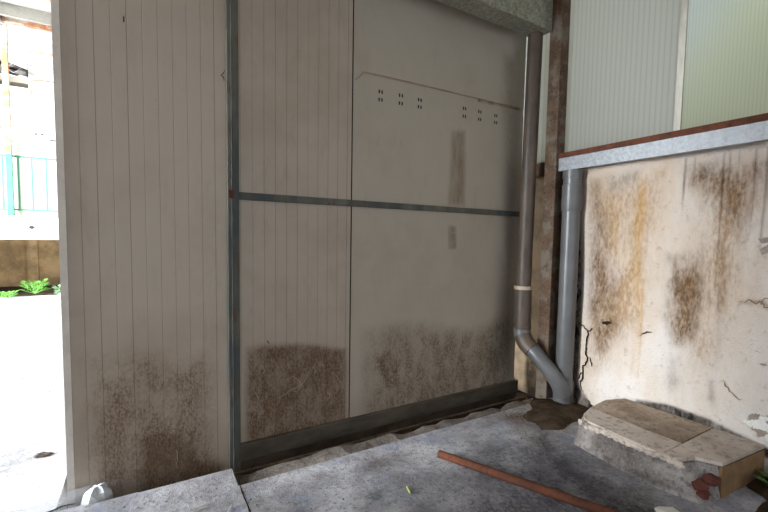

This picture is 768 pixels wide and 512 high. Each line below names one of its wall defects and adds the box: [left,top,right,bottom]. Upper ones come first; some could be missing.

leakage [699,171,745,272]
leakage [573,231,593,408]
crack [577,324,592,390]
leakage [594,252,634,341]
leakage [671,268,701,340]
flaking render [743,413,768,441]